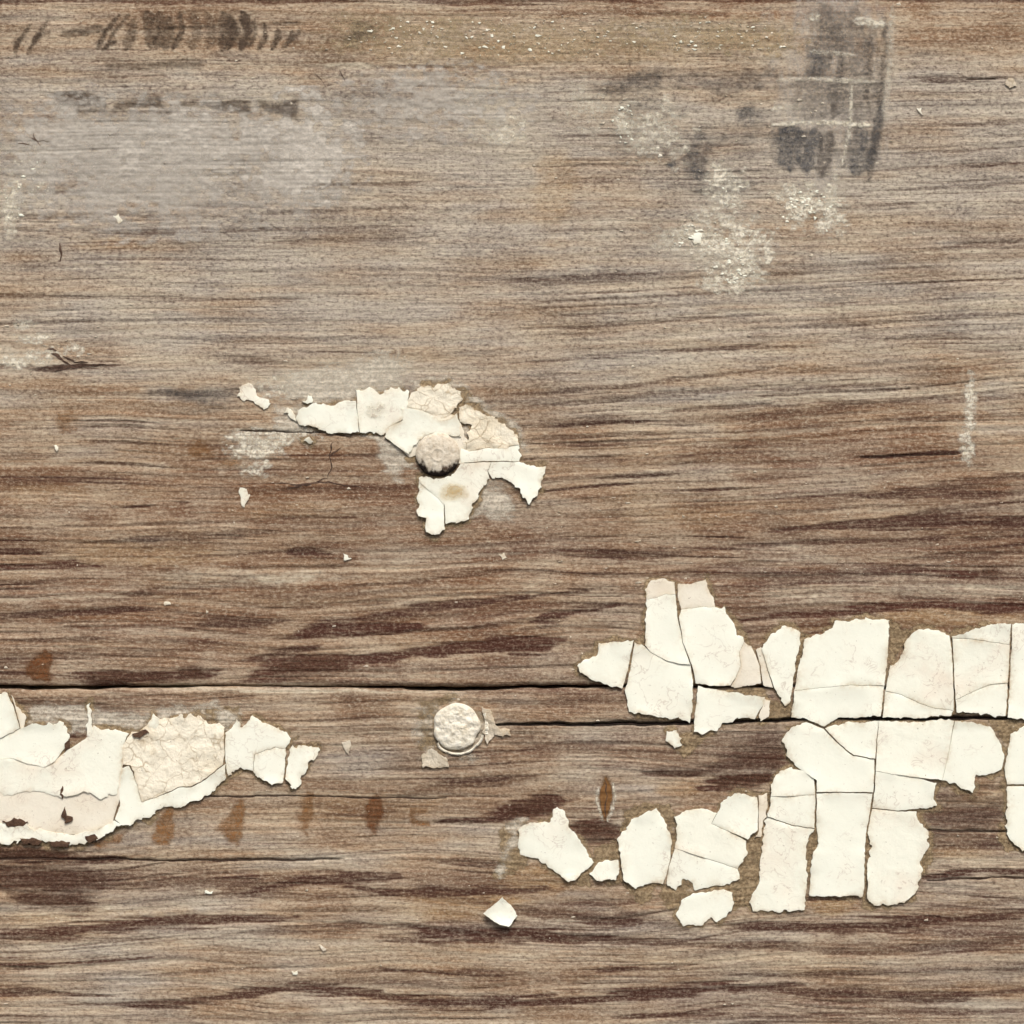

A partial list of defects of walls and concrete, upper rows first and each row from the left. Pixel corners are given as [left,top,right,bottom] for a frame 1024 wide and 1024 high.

peeling [237,351,548,541]
peeling [0,692,321,851]
crack [499,719,694,727]
peeling [493,574,1024,928]
crack [722,716,805,724]
crack [837,714,1022,722]